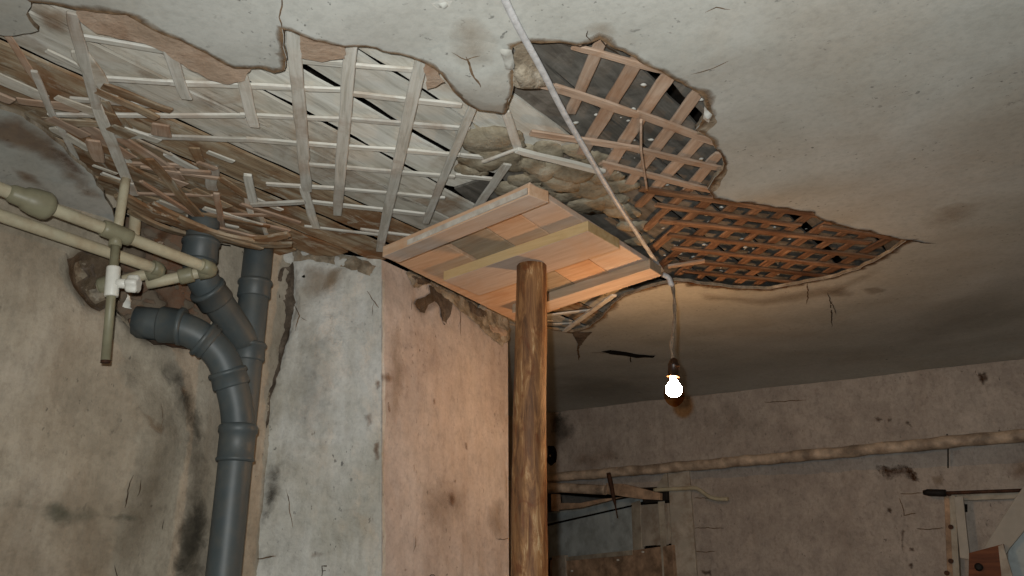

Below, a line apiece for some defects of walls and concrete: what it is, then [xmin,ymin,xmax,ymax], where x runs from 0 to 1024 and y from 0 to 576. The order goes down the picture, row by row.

spalling [28,0,914,360]
crack [806,286,836,326]